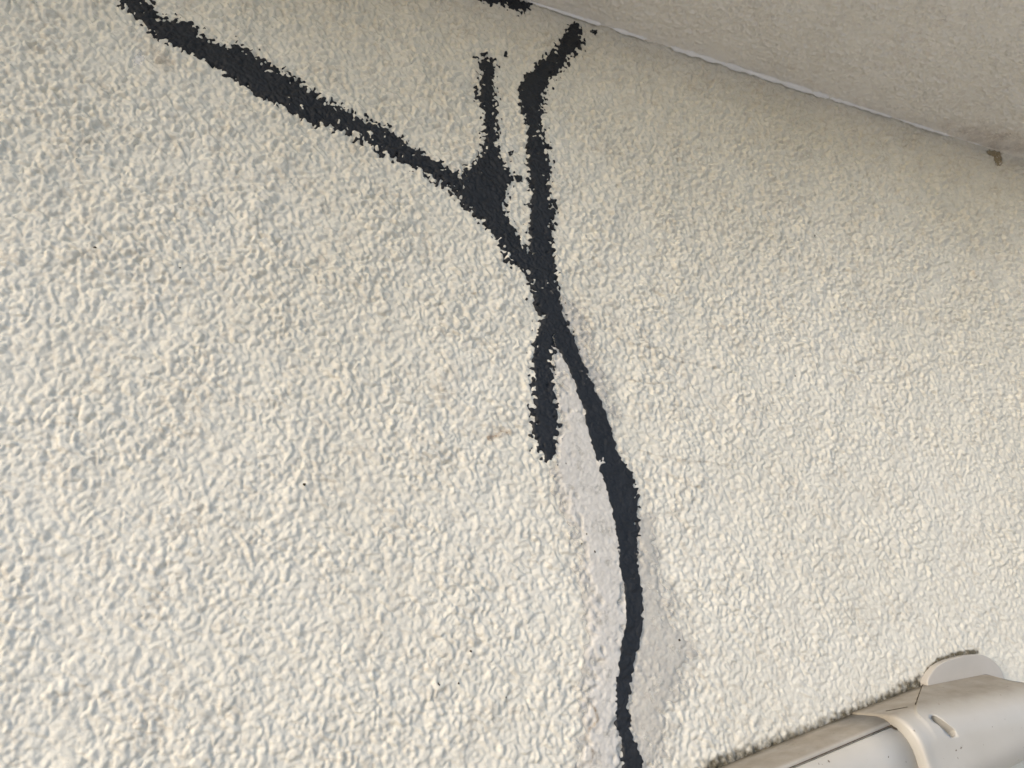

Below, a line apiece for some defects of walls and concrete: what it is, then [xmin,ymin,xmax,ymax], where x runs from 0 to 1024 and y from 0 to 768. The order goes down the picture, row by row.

crack [117,0,644,768]